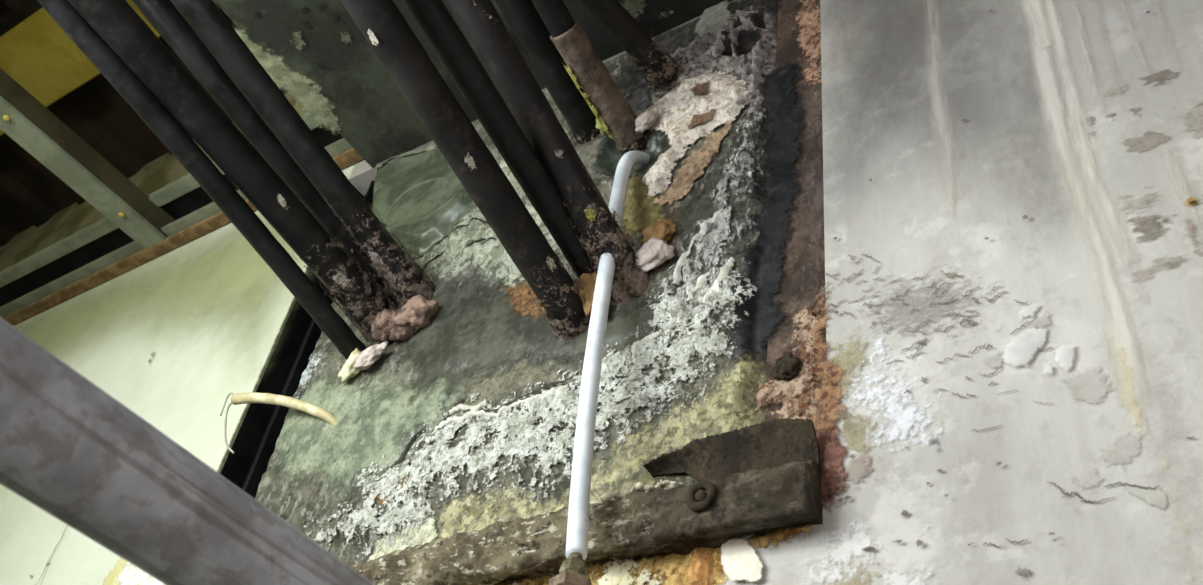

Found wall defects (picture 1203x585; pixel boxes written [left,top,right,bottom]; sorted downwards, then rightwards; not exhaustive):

flaking render [642,6,778,206]
leakage [590,106,770,502]
rust [749,0,848,511]
leakage [832,339,942,452]
flaking render [819,254,1007,365]
peeling [904,304,1075,398]
leakage [304,360,582,560]
rust [496,575,556,585]
rust [586,547,727,585]
rust [747,524,812,548]